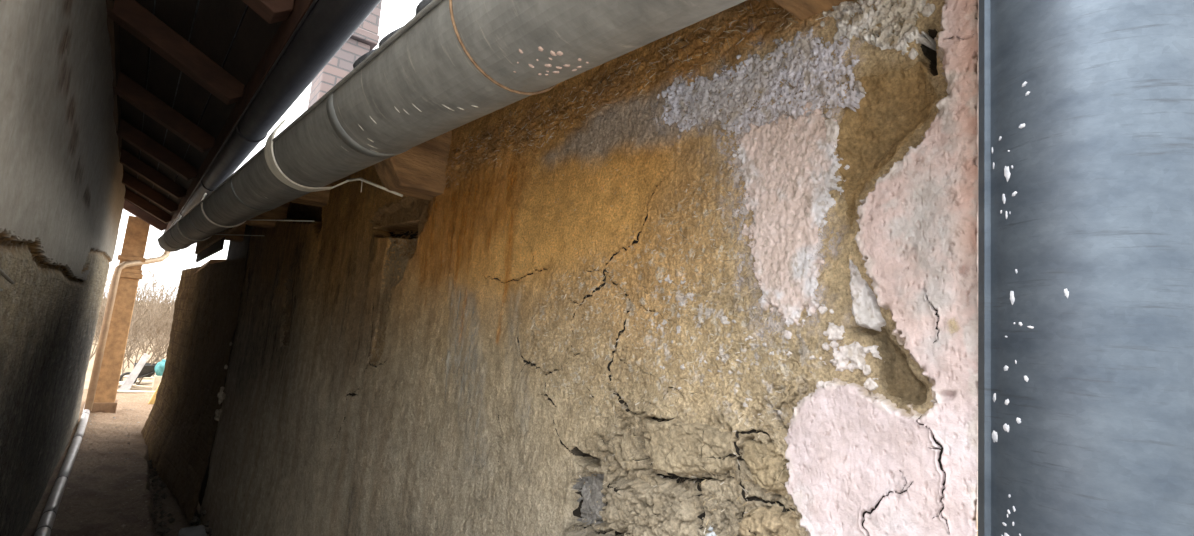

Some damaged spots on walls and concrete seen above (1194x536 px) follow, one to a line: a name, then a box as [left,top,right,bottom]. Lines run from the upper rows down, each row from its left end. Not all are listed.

flaking render [0,0,126,282]
spalling [571,447,598,459]
crack [517,181,793,536]
flaking render [645,0,978,536]
crack [862,483,912,530]
crack [917,415,949,531]